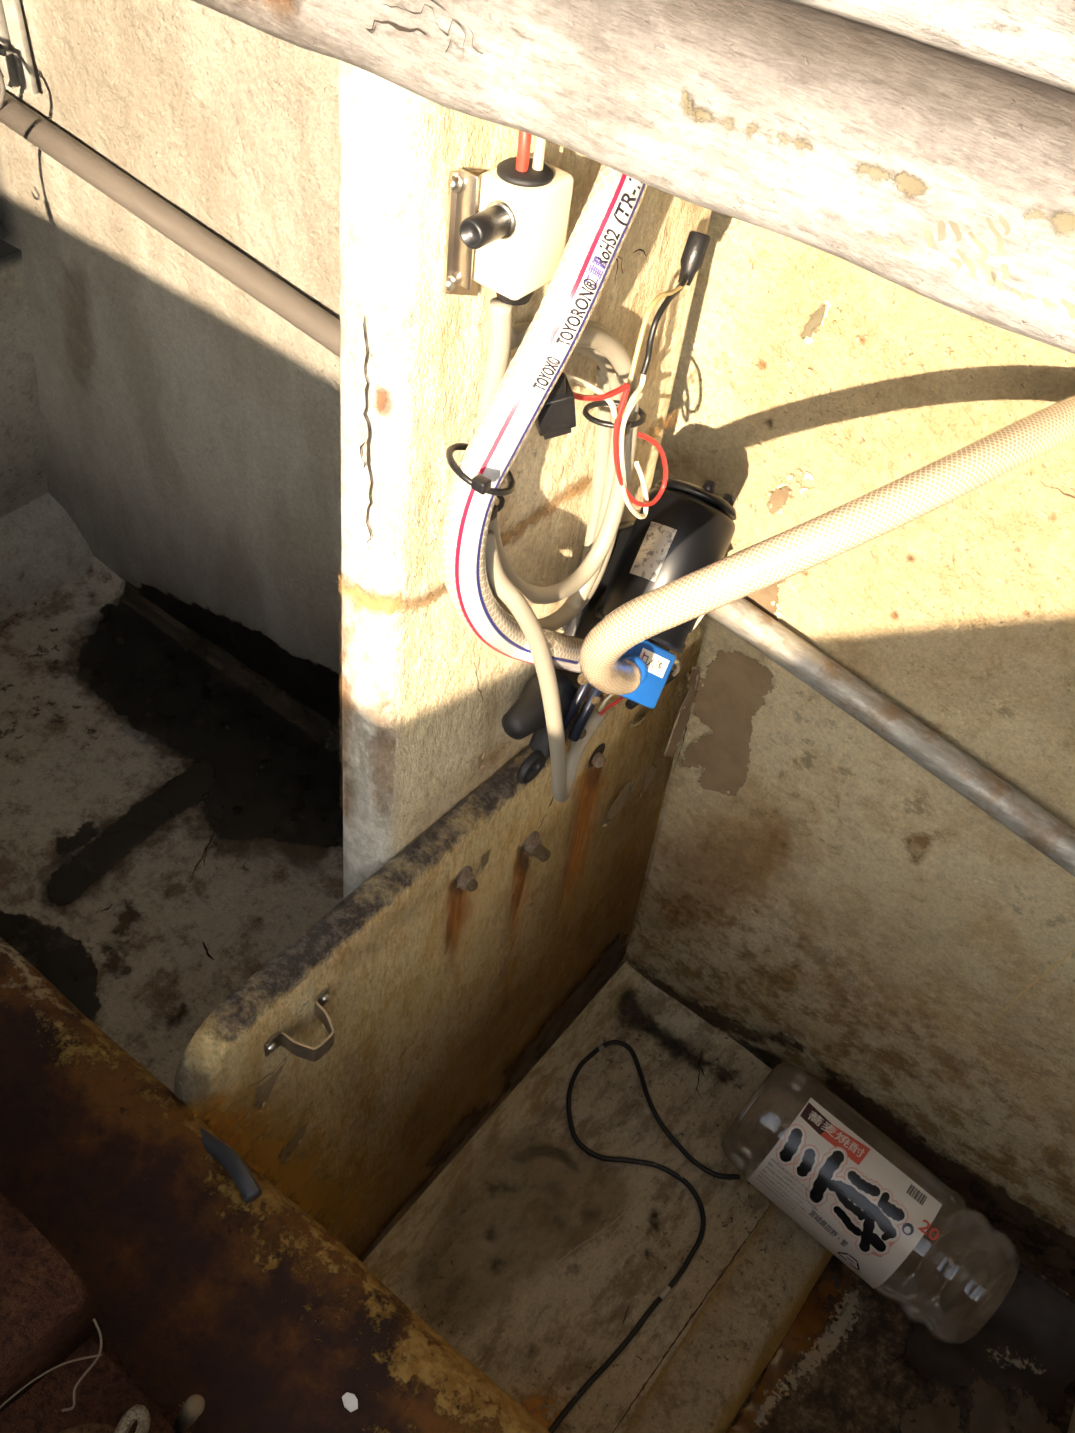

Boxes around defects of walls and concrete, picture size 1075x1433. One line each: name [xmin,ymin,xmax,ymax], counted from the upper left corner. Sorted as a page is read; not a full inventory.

crack [384,0,483,54]
crack [360,316,372,549]
peeling [743,578,788,621]
peeling [664,650,776,796]
rust [446,880,463,949]
rust [512,848,528,904]
damp [619,990,745,1087]
damp [628,959,804,1069]
damp [820,1062,1075,1302]